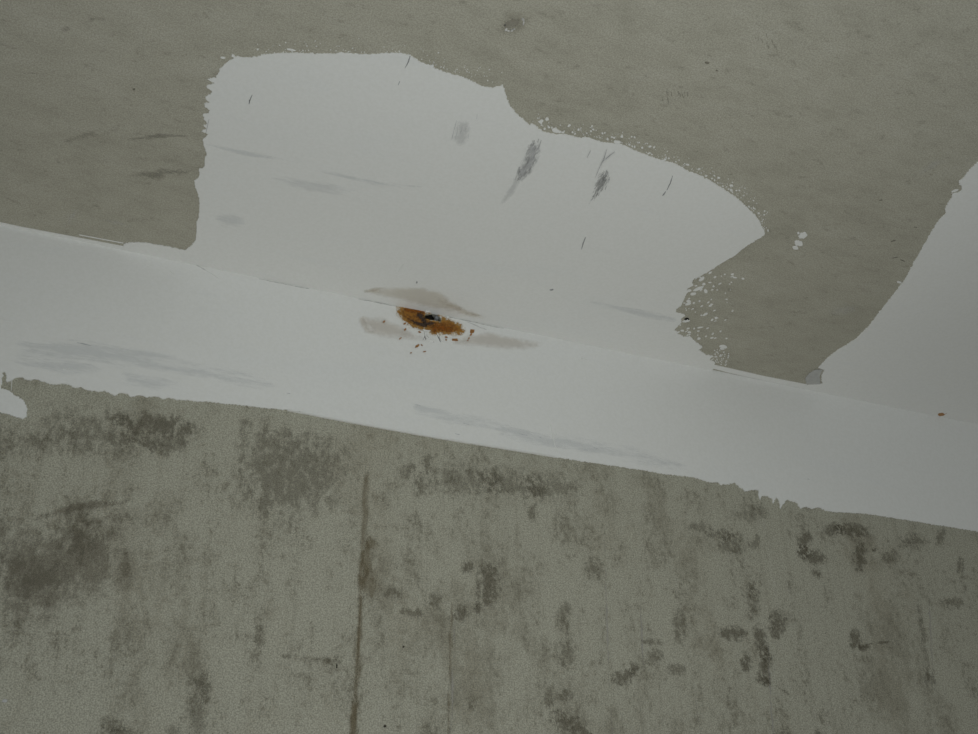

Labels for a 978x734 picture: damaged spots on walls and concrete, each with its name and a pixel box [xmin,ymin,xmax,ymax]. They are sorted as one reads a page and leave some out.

peeling [422,311,449,342]
corrosion [397,307,474,354]